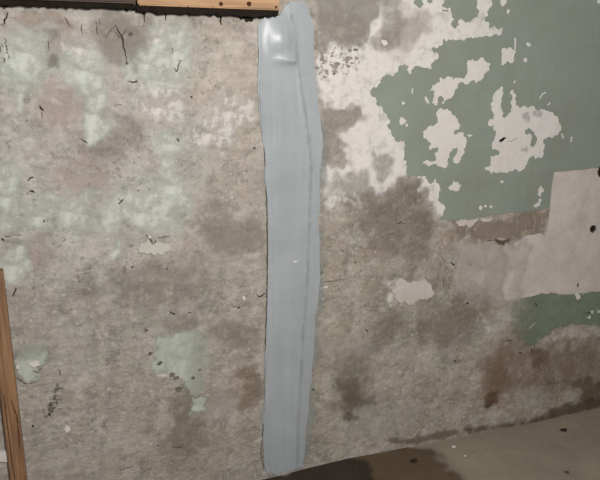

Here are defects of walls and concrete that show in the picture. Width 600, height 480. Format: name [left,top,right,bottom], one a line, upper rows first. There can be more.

water stain [104,11,191,124]
peeling [501,38,516,65]
water stain [81,85,110,146]
peeling [314,0,503,217]
peeling [485,81,573,183]
water stain [159,158,191,208]
water stain [321,183,354,209]
water stain [0,246,32,285]
peeling [384,278,434,307]
peeling [538,310,600,344]
peeling [14,349,48,384]
peeling [149,332,206,414]